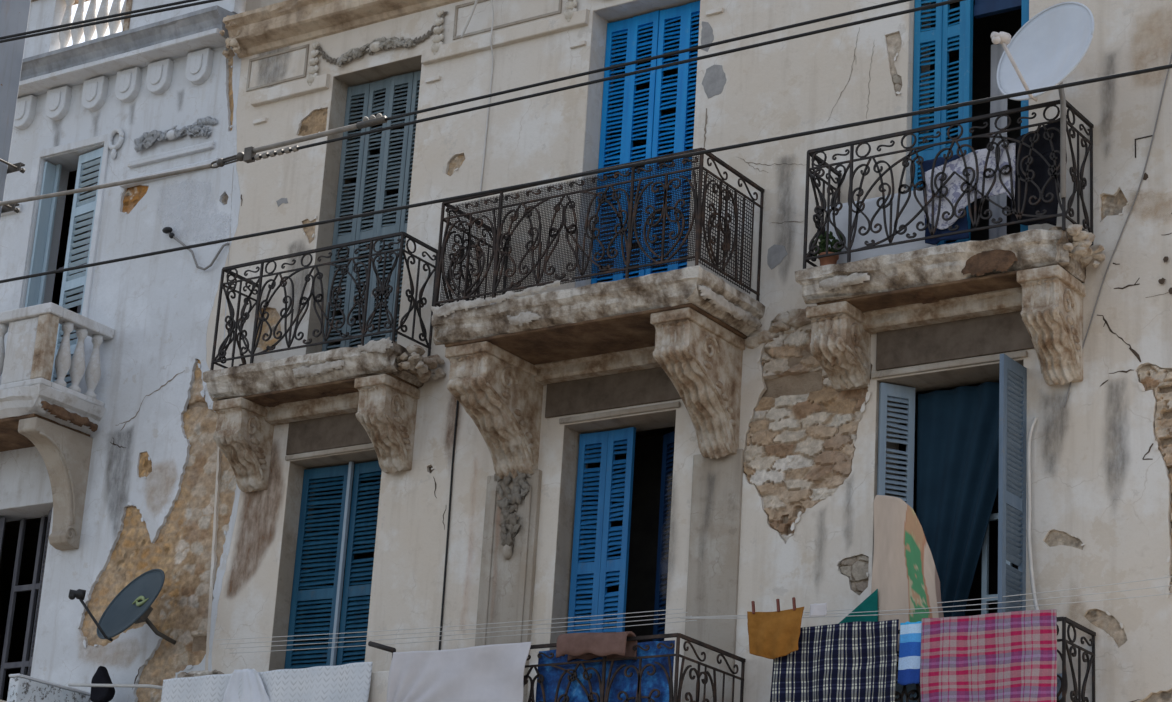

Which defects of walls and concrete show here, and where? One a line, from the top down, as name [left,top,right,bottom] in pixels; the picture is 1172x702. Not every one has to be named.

peeling [886,32,902,95]
spalling [120,185,149,214]
spalling [1101,185,1129,220]
spalling [1049,224,1105,268]
crack [110,370,185,448]
spalling [698,284,873,542]
spalling [1137,364,1172,598]
spalling [81,360,237,702]
spalling [1044,530,1085,550]
spalling [837,555,869,595]
spalling [1085,609,1127,647]
spalling [1143,690,1172,702]